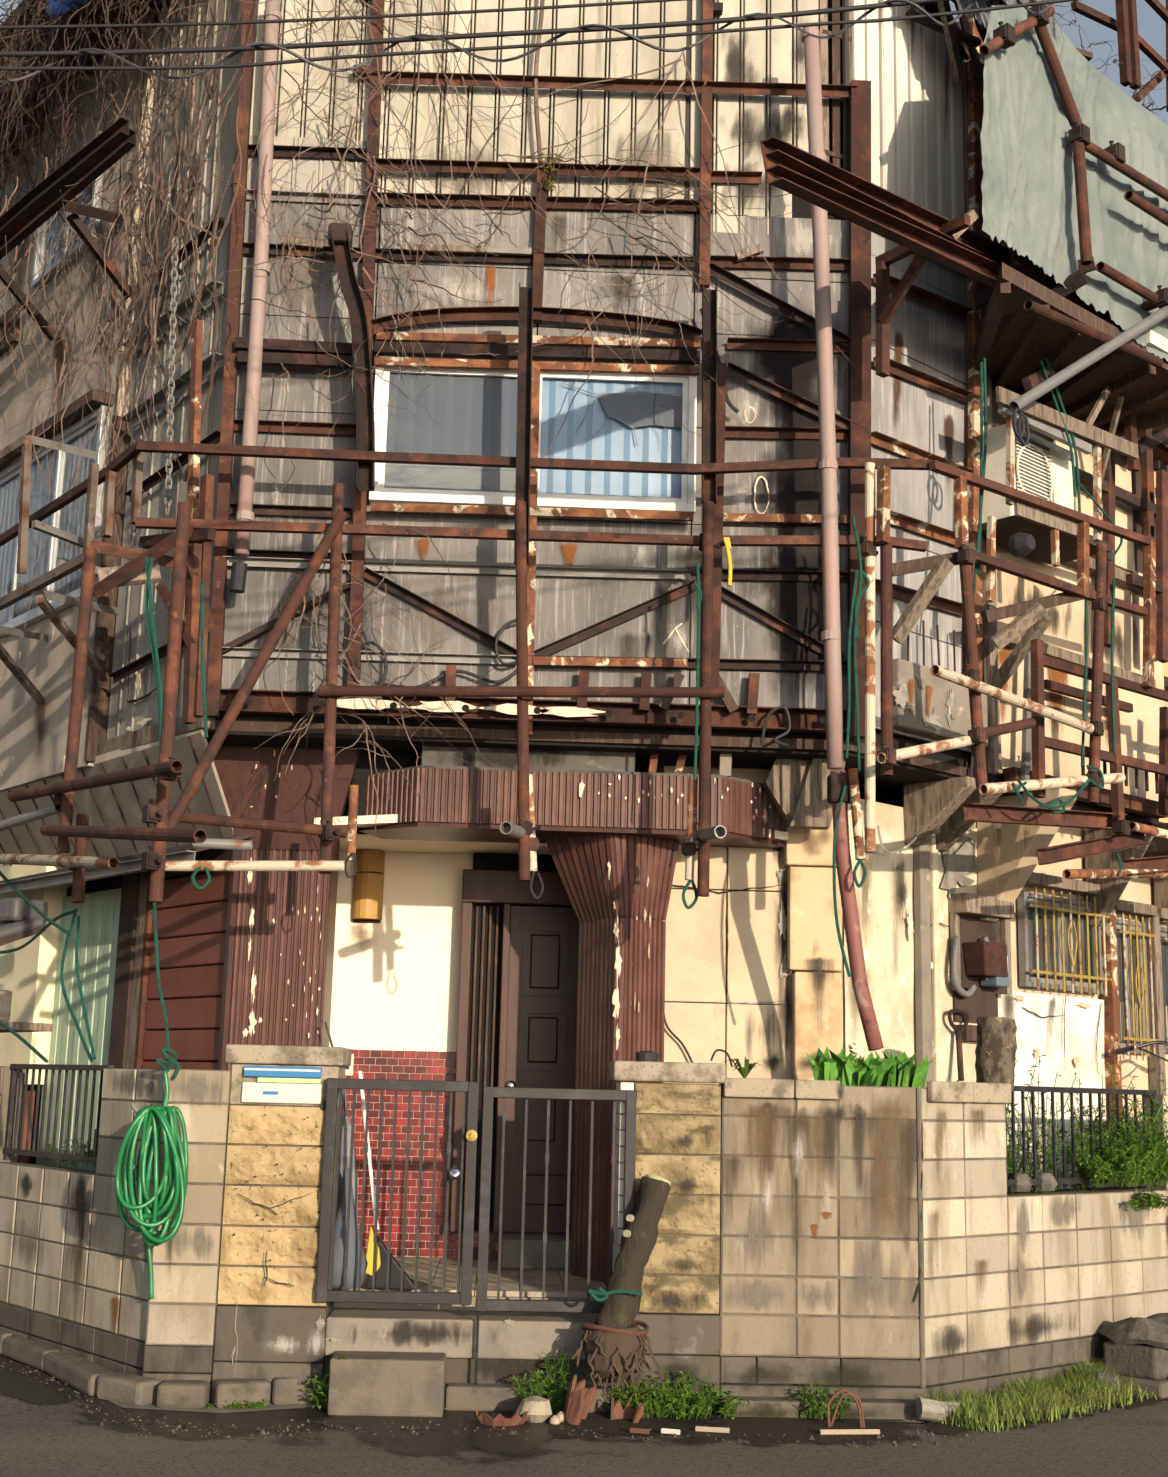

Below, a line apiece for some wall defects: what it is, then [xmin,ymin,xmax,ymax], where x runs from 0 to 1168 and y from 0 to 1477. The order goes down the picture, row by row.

water stain [728,38,753,82]
water stain [733,105,802,205]
peeling [579,775,684,804]
water stain [897,862,907,911]
peeling [242,905,263,1038]
peeling [612,902,651,1050]
water stain [811,957,825,1012]
water stain [21,1175,32,1196]
water stain [69,1175,90,1290]
water stain [168,1231,211,1260]
water stain [727,1103,916,1215]
water stain [1009,1202,1029,1298]